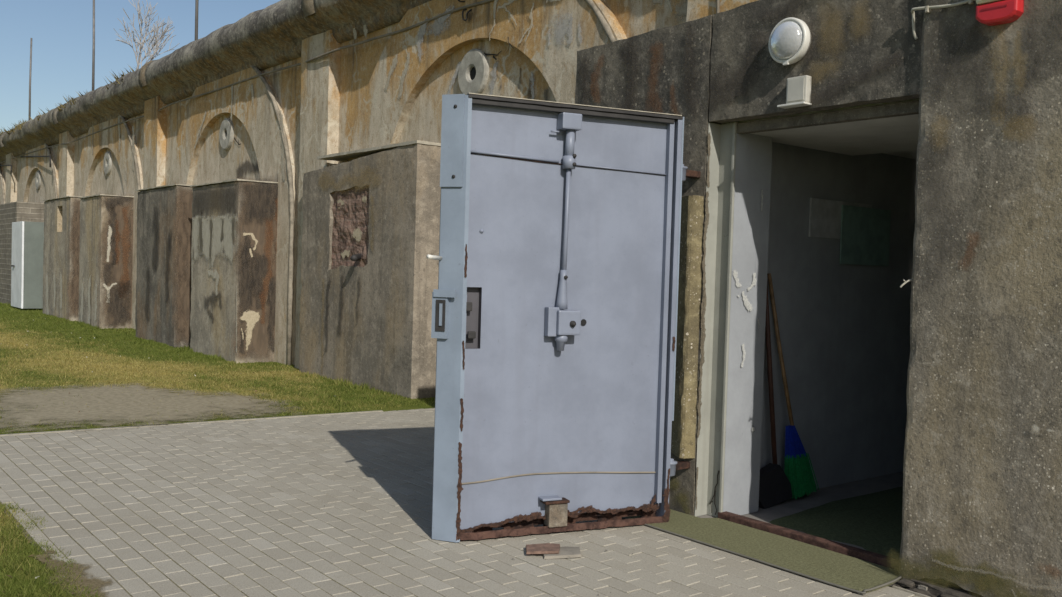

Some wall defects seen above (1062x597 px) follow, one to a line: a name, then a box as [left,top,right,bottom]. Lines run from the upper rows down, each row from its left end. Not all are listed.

flaking render [331,185,369,269]
corrosion [456,398,546,540]
corrosion [567,468,671,524]